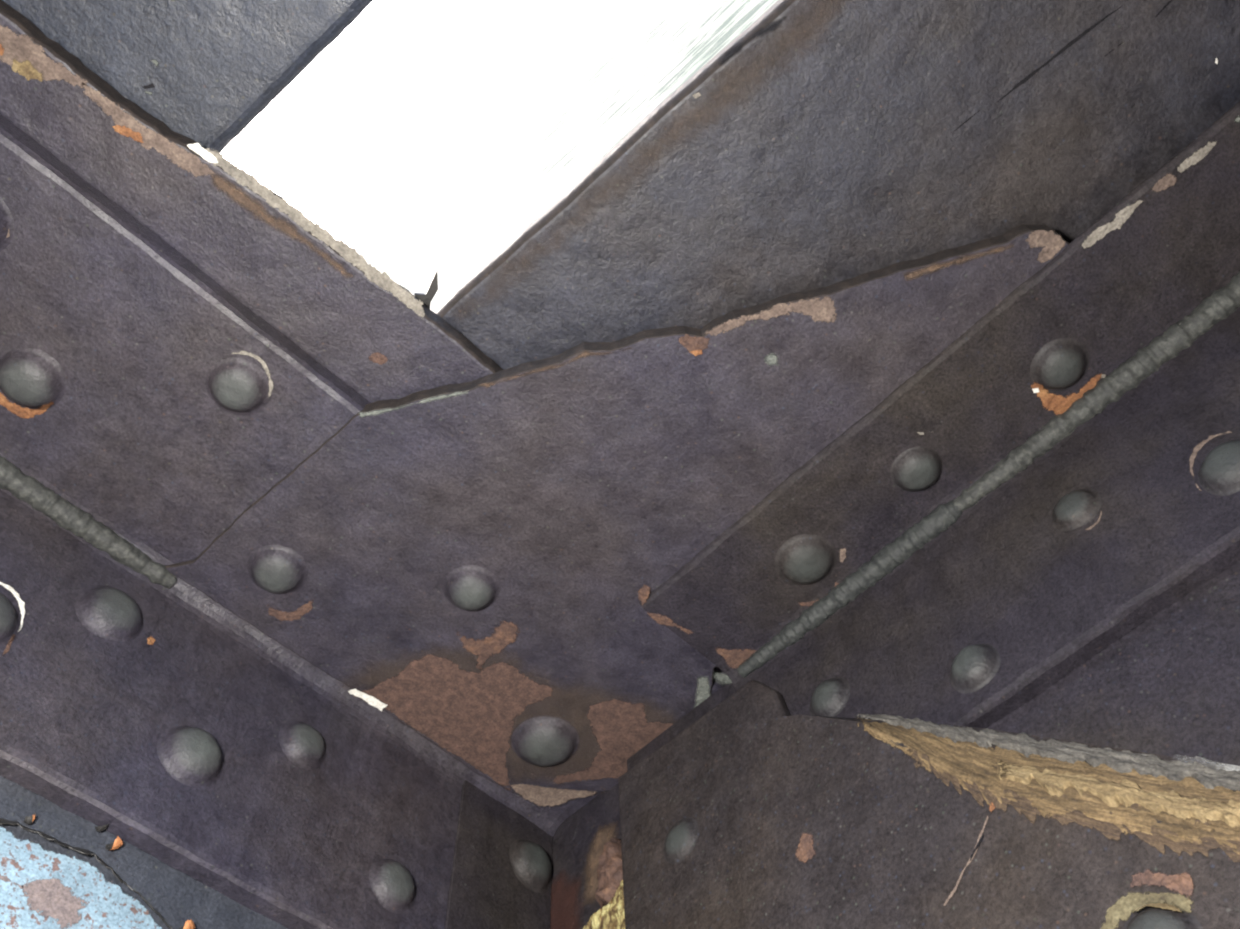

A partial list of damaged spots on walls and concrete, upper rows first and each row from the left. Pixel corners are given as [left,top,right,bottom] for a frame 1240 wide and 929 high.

rust [0,25,351,276]
spalling [1152,141,1217,192]
spalling [905,247,1010,280]
spalling [1025,230,1065,263]
spalling [1082,200,1142,248]
spalling [678,296,837,356]
spalling [359,351,607,417]
rust [1031,374,1101,415]
rust [856,714,1240,863]
peeling [0,813,195,929]
rust [583,827,625,929]
rust [1100,869,1194,929]